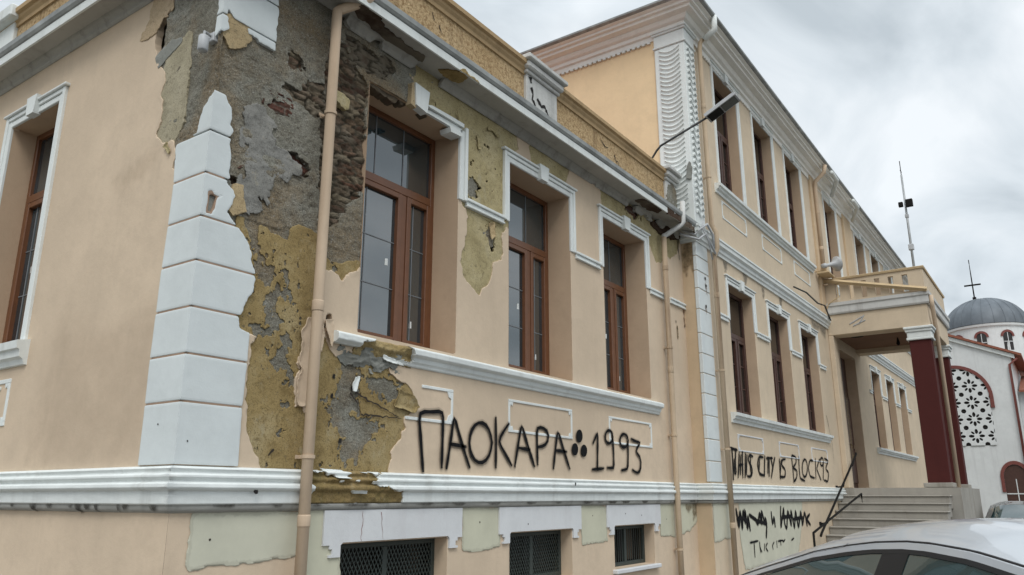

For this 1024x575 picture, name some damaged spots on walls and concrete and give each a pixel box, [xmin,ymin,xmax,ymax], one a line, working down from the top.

crack [529,77,549,116]
spalling [140,0,569,494]
spalling [600,190,680,263]
spalling [666,184,677,207]